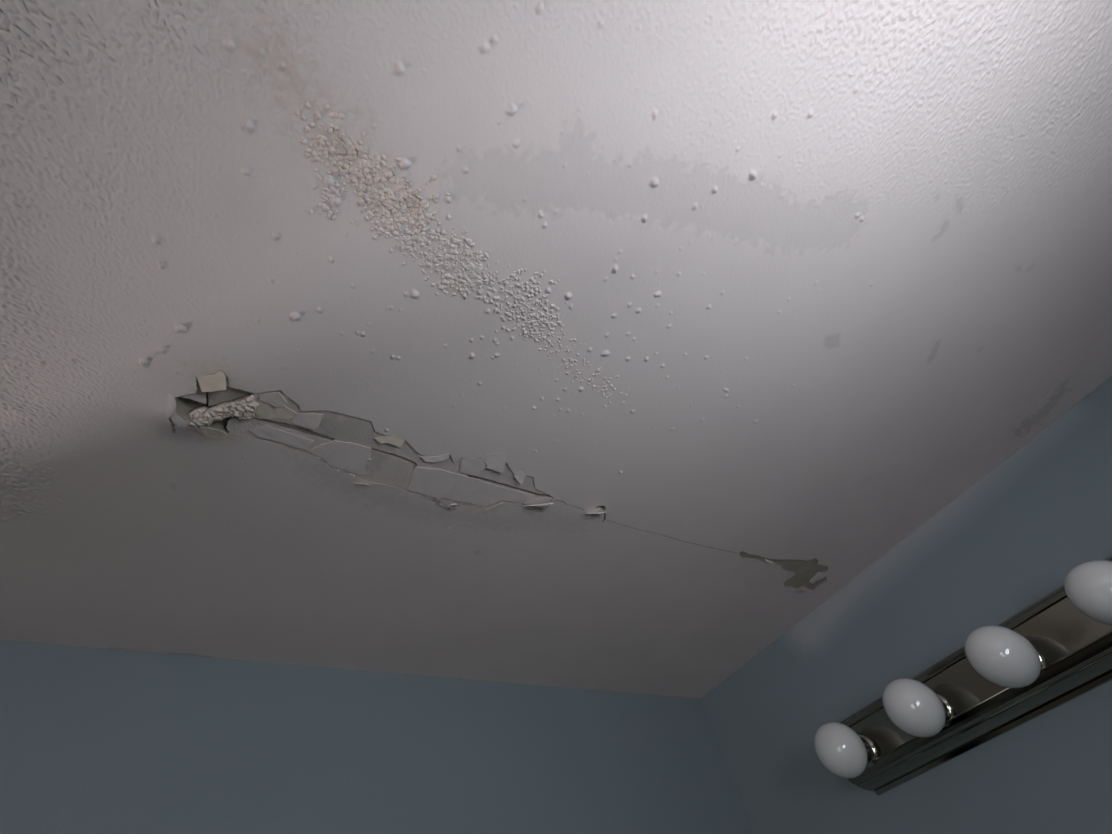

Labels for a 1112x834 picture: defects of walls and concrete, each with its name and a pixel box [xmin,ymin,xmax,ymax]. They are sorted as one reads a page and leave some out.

peeling [165,370,584,512]
crack [587,505,735,553]
peeling [739,551,829,594]